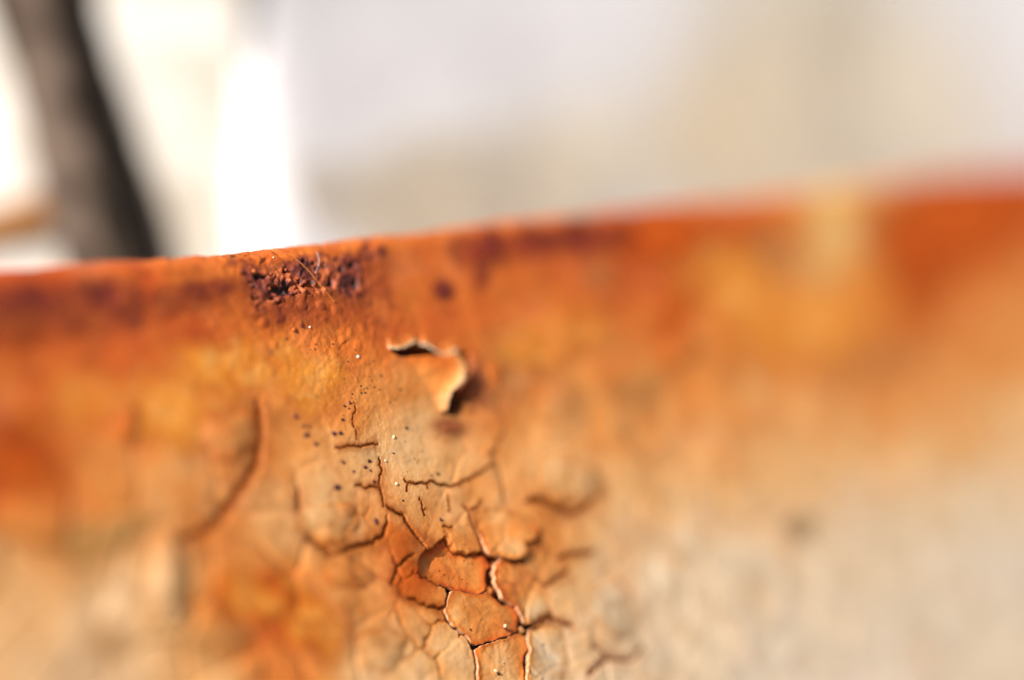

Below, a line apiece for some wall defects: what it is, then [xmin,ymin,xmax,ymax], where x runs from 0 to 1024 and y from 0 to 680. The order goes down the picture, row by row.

corrosion [457,213,706,286]
corrosion [794,184,861,296]
corrosion [875,172,1024,317]
corrosion [0,282,143,346]
corrosion [137,241,388,448]
peeling [388,333,466,412]
corrosion [434,280,454,299]
corrosion [450,354,525,405]
corrosion [436,419,467,438]
crack [295,403,496,610]
crack [524,494,600,545]
crack [530,615,573,627]